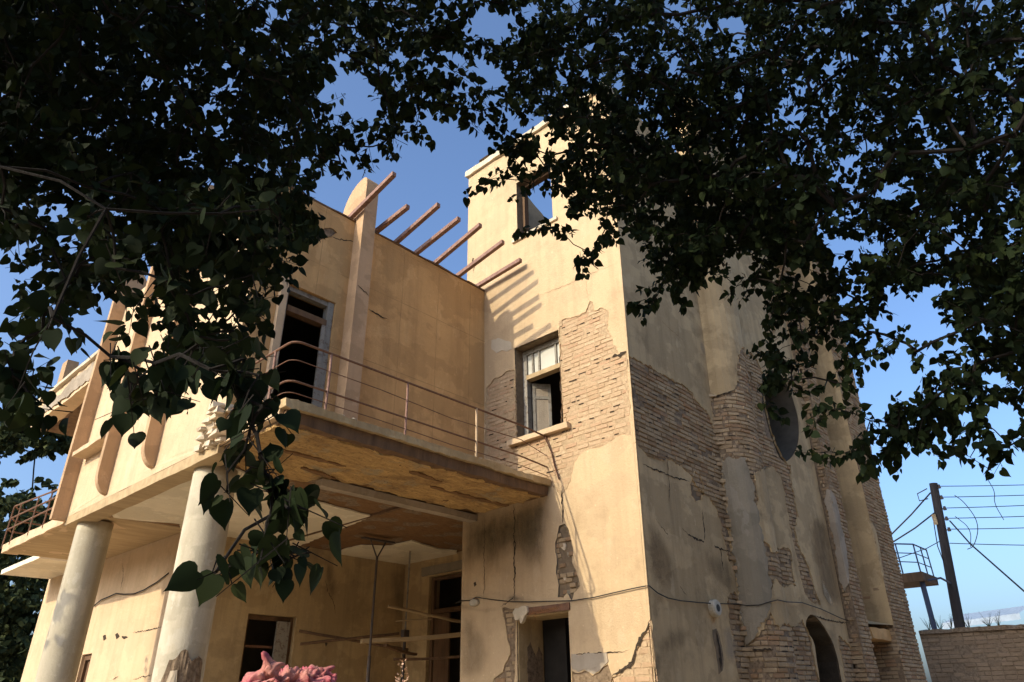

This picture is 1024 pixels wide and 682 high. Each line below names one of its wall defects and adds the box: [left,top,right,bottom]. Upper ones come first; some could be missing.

spalling [484,301,821,605]
crack [483,508,516,607]
spalling [161,649,203,682]
spalling [493,607,544,682]
crack [576,623,650,676]
spalling [571,619,658,682]
spalling [712,591,820,682]